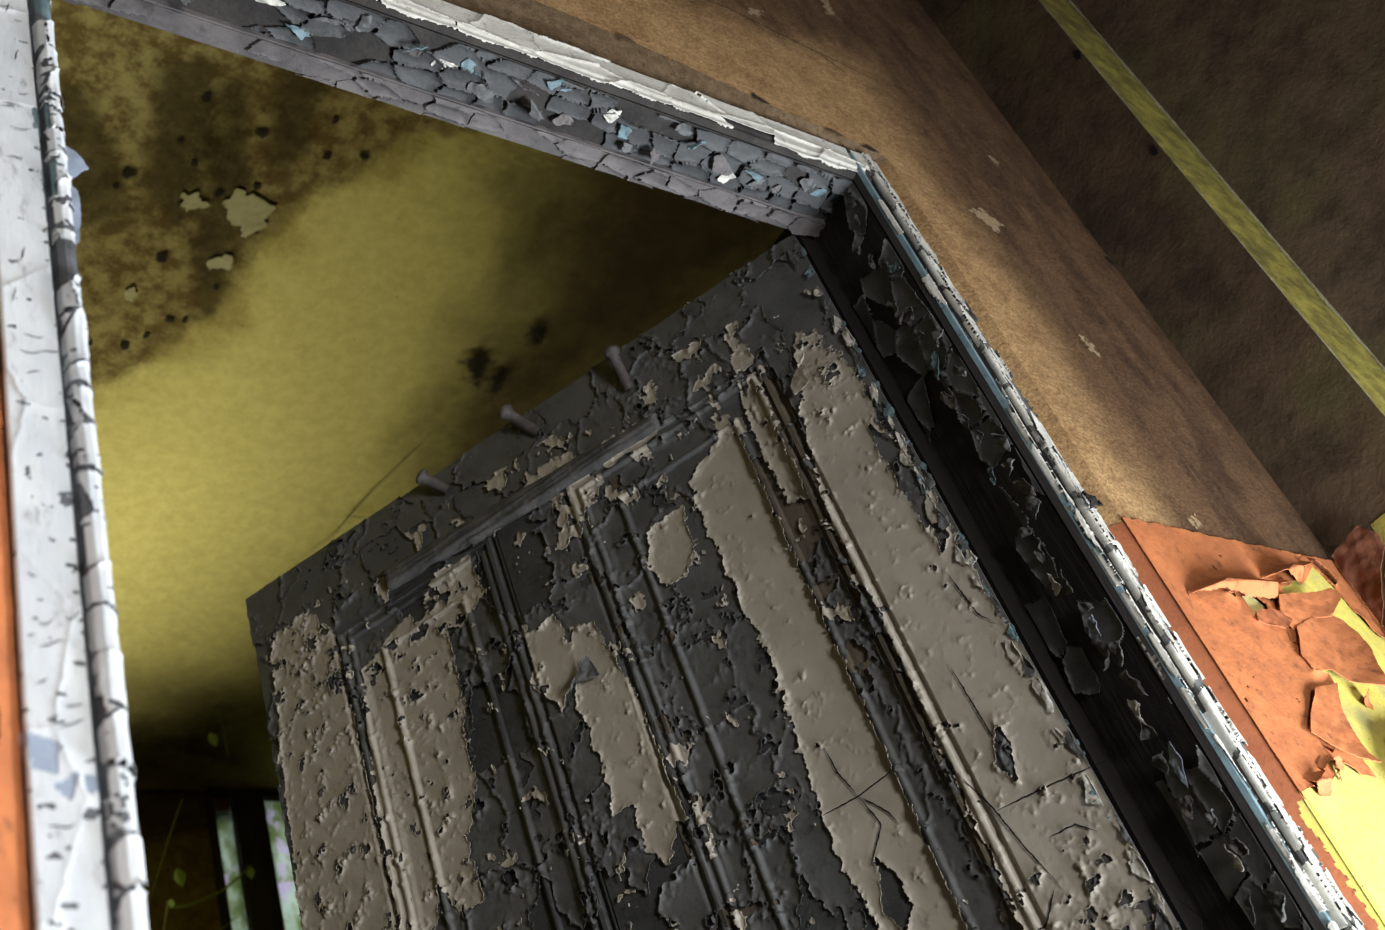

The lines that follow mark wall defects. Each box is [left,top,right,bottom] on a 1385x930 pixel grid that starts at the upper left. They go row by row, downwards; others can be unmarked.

peeling [255,0,372,40]
peeling [180,188,276,238]
damp [50,0,474,386]
peeling [403,45,496,103]
peeling [511,77,574,126]
peeling [603,109,633,152]
peeling [674,123,782,194]
peeling [788,249,855,347]
peeling [857,365,950,530]
peeling [886,301,1218,827]
peeling [1187,513,1385,924]
peeling [1116,818,1175,930]